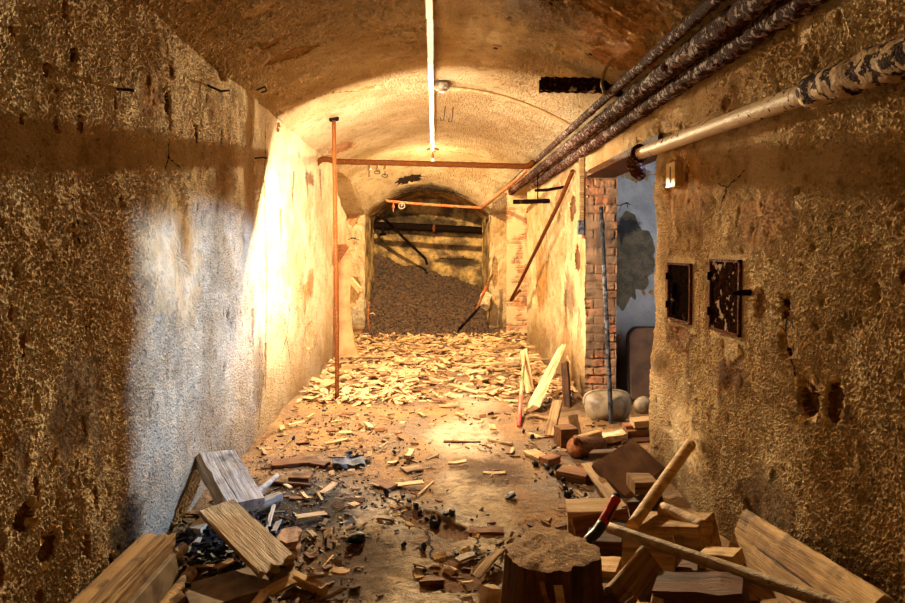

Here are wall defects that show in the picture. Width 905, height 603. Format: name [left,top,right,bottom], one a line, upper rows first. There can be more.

crack [718,170,745,208]
peeling [616,211,656,311]
crack [775,292,796,376]
spalling [794,367,846,427]